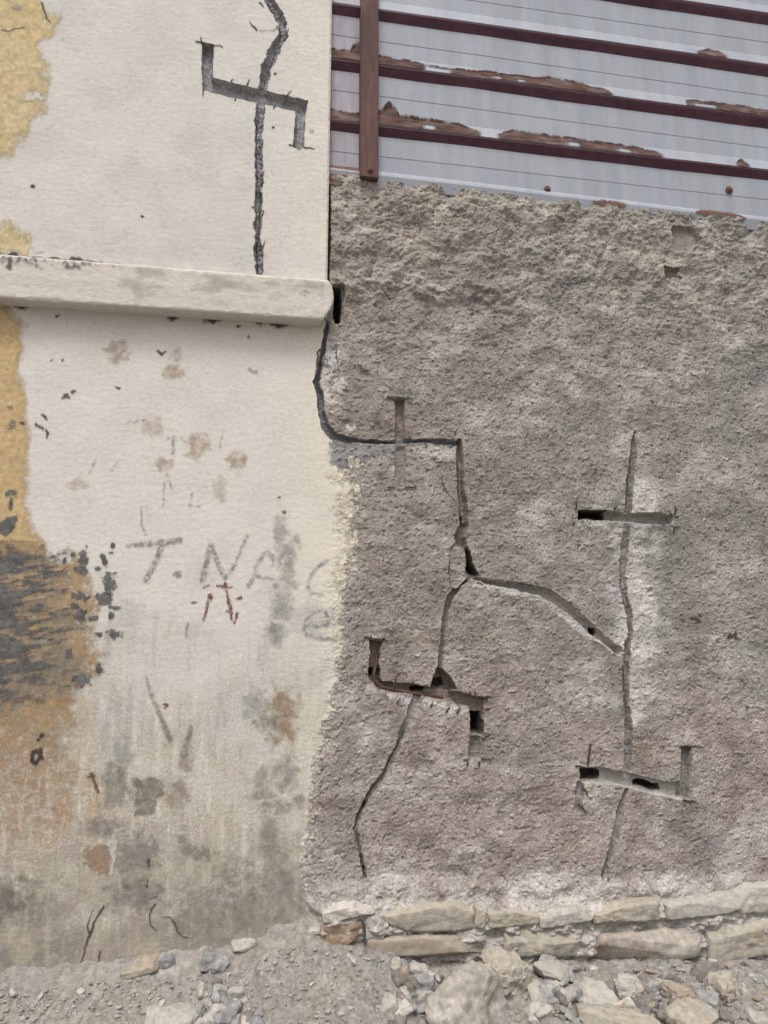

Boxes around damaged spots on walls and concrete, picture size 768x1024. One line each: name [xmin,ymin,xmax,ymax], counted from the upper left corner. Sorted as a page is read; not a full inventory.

peeling [0,0,62,157]
crack [249,0,289,275]
rust [331,42,360,61]
rust [378,101,480,136]
rust [378,54,613,95]
rust [499,129,663,157]
rust [686,99,768,116]
peeling [0,305,123,780]
crack [312,319,638,883]
water stain [244,692,298,744]
water stain [102,743,185,815]
water stain [253,758,302,849]